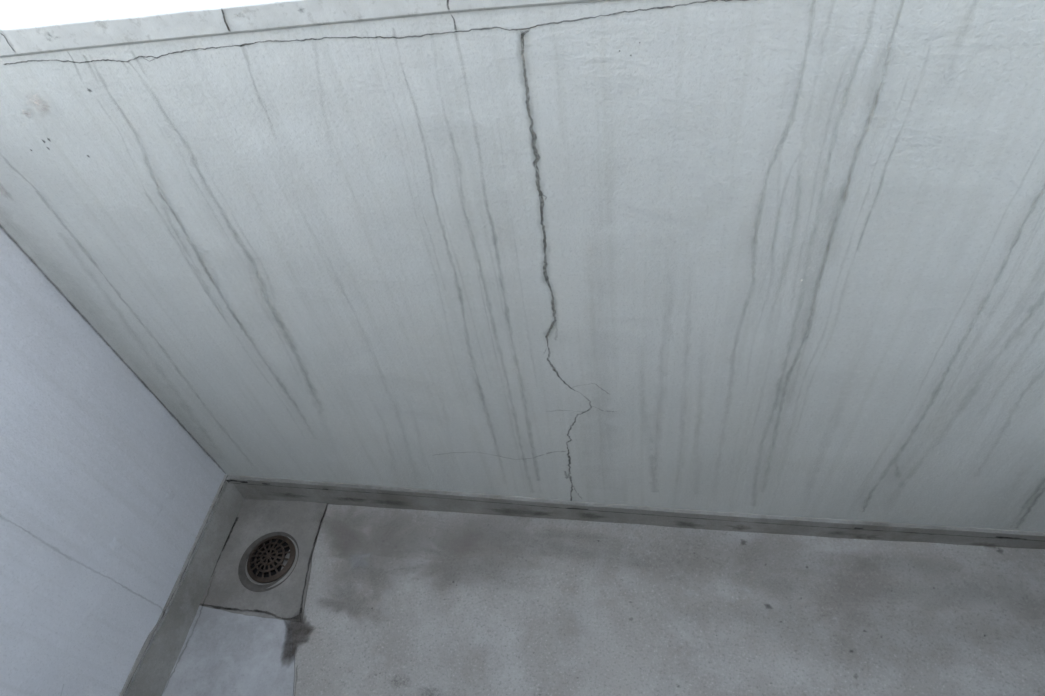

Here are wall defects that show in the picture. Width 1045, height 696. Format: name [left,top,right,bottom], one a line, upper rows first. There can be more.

crack [1,0,748,389]
crack [567,418,576,501]
leakage [283,615,313,661]